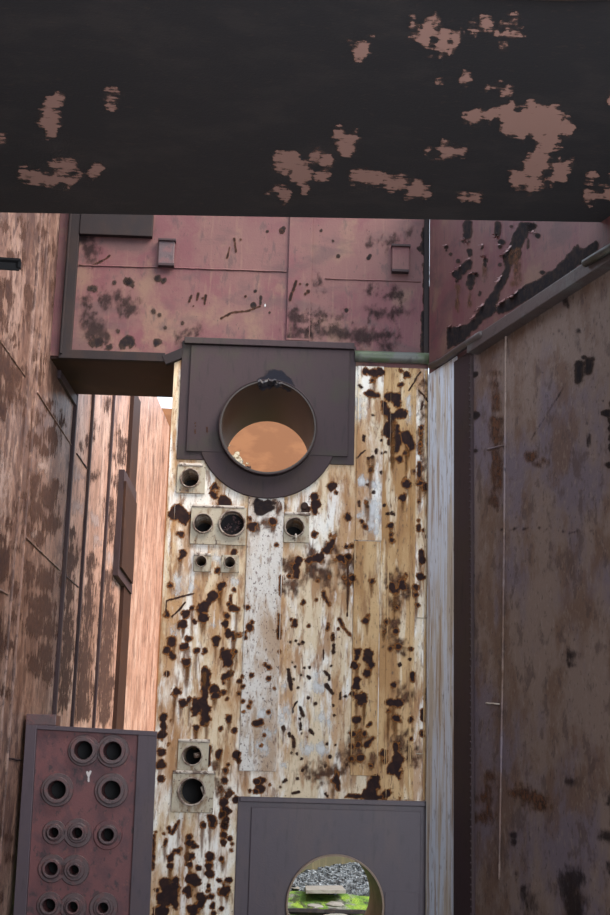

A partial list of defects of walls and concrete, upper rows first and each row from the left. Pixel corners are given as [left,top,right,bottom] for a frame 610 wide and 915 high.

peeling [408,11,526,59]
peeling [266,124,361,203]
peeling [349,169,432,200]
peeling [461,80,576,193]
peeling [444,220,599,359]
corrosion [361,366,428,509]
corrosion [0,277,118,729]
leakage [71,498,102,548]
corrosion [168,503,191,538]
corrosion [278,530,356,596]
corrosion [152,567,276,915]
corrosion [330,648,427,801]